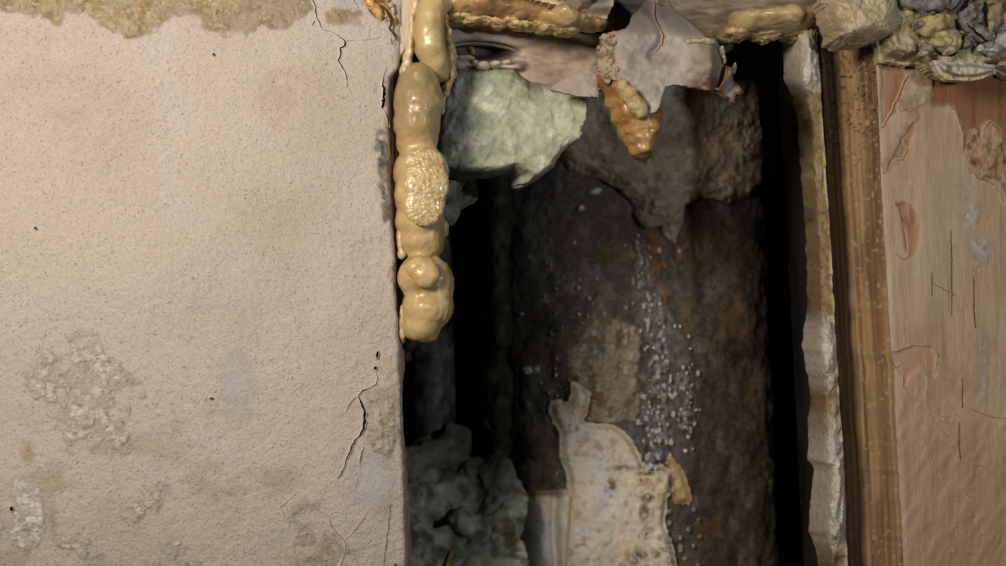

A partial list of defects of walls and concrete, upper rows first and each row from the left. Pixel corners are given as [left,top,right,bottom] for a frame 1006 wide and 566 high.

damp [0,0,310,38]
damp [327,0,361,23]
crack [310,0,382,99]
crack [380,67,390,127]
damp [566,245,695,465]
crack [328,372,395,566]